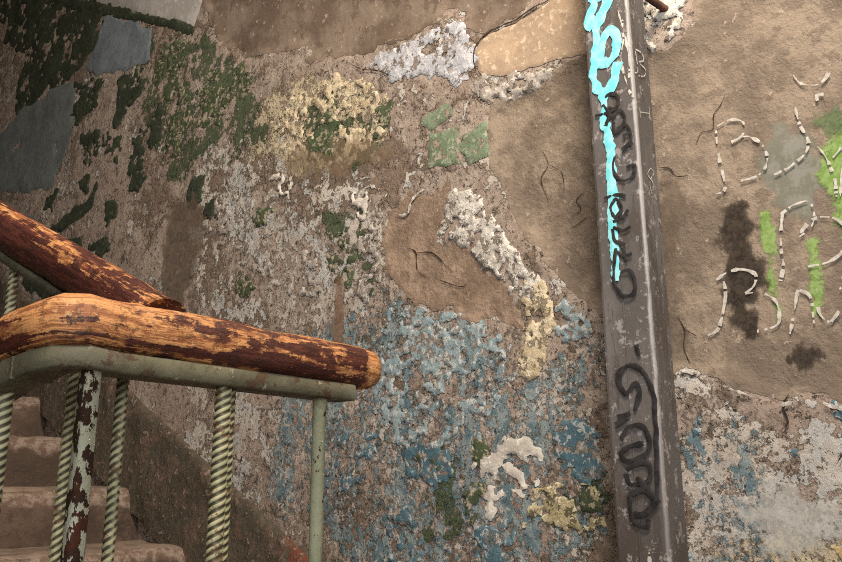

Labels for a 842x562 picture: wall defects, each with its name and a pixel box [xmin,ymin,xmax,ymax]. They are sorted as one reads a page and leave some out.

flaking render [0,0,603,493]
crack [409,248,468,287]
flaking render [643,0,842,420]
peeling [461,416,607,562]